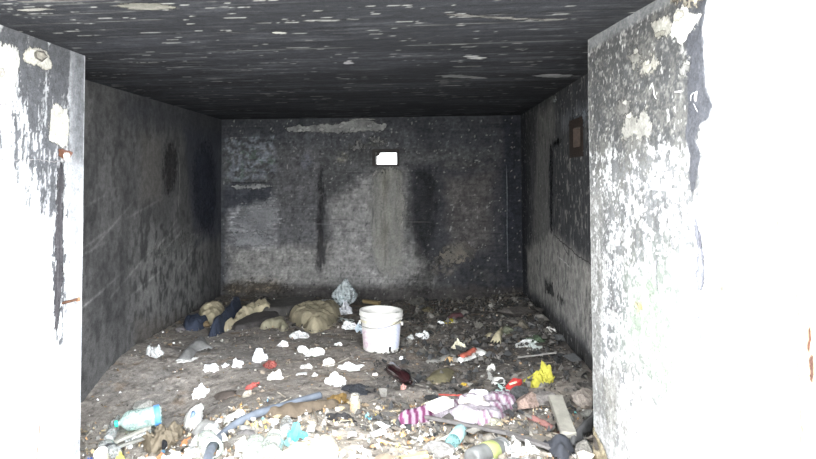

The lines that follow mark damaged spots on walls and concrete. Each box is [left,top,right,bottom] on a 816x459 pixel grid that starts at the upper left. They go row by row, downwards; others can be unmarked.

peeling [651,0,701,45]
peeling [0,41,53,107]
peeling [627,47,660,77]
peeling [680,58,690,76]
corrosion [58,149,73,162]
peeling [286,118,388,156]
peeling [618,98,653,144]
water stain [317,168,326,271]
water stain [369,166,437,290]